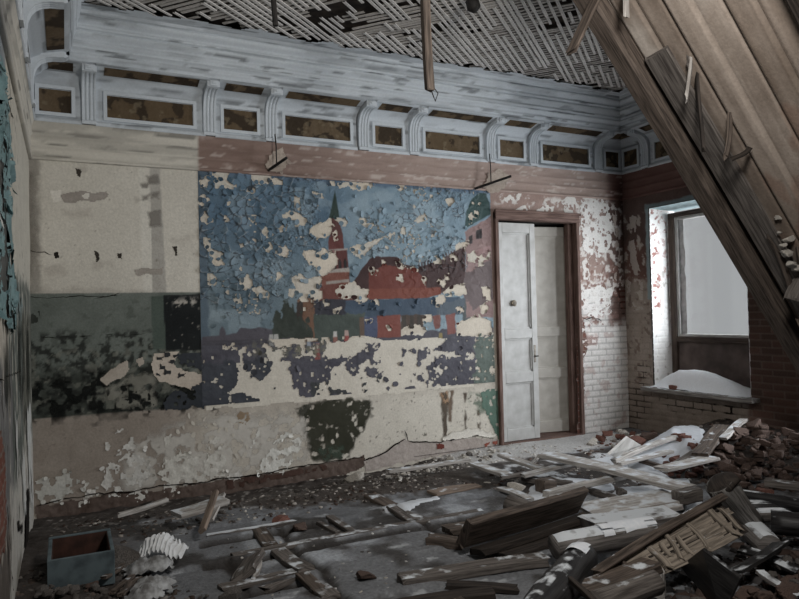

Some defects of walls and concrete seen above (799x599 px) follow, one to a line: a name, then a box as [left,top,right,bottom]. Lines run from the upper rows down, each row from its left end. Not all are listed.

peeling [0,55,40,335]
peeling [50,190,109,203]
peeling [198,171,235,223]
flaking render [248,147,291,193]
peeling [134,267,163,276]
peeling [203,237,229,297]
peeling [232,180,457,316]
peeling [414,214,491,266]
peeling [483,169,643,433]
peeling [0,273,499,564]